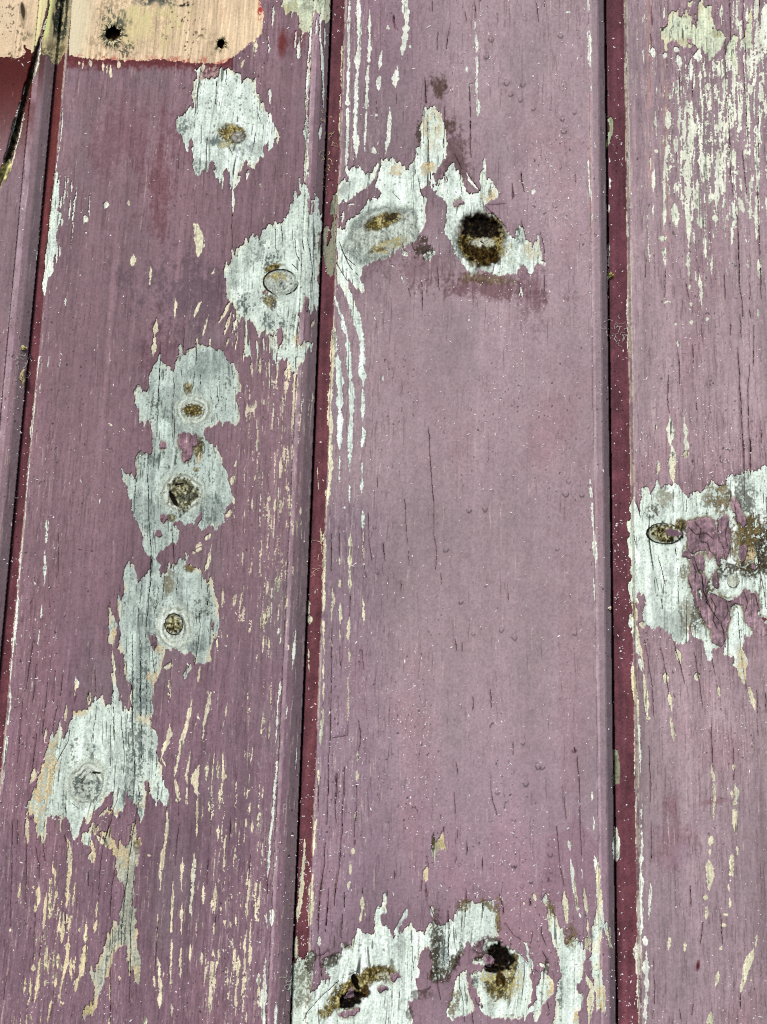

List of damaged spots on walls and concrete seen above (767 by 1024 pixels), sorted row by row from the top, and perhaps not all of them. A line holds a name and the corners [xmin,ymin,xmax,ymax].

peeling [624,0,767,307]
peeling [0,0,546,1024]
peeling [290,827,613,1024]
peeling [627,415,767,1024]